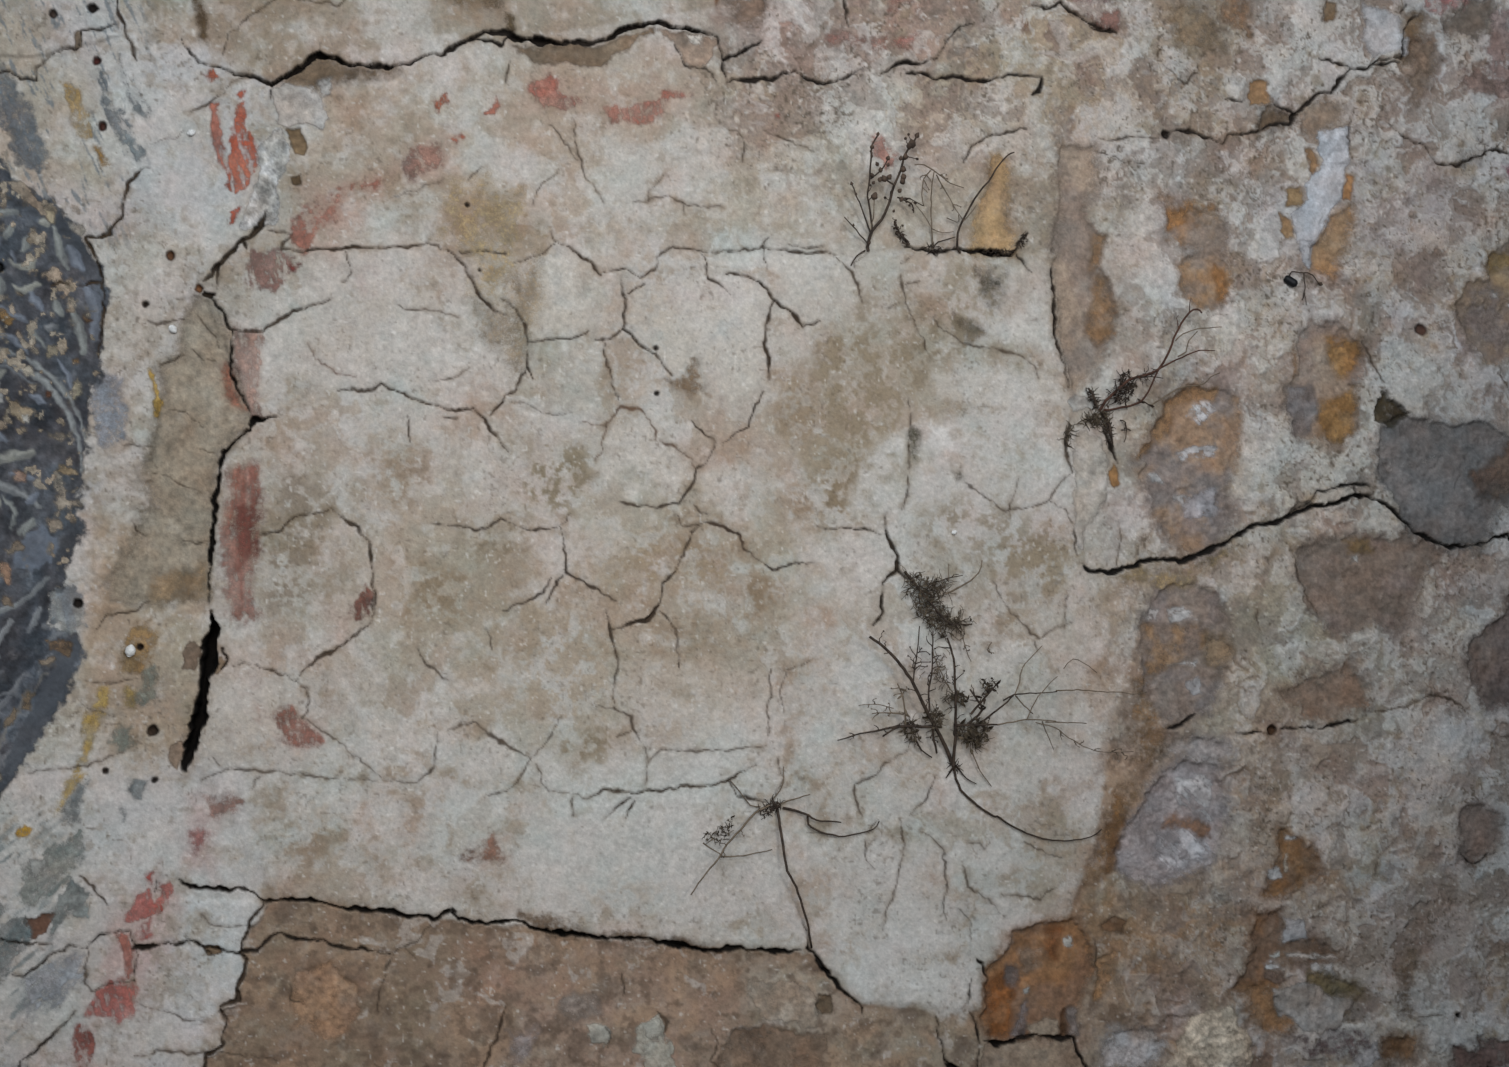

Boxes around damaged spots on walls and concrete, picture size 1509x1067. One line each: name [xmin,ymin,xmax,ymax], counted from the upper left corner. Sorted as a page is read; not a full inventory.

crack [181,18,1043,163]
crack [901,232,1068,380]
crack [148,212,860,816]
crack [844,421,911,626]
spalling [1072,383,1242,558]
crack [968,429,1509,575]
spalling [1282,318,1509,637]
spalling [1102,581,1237,884]
spalling [1467,595,1509,712]
crack [854,762,990,914]
spalling [979,916,1127,1067]
spalling [1233,827,1364,1033]